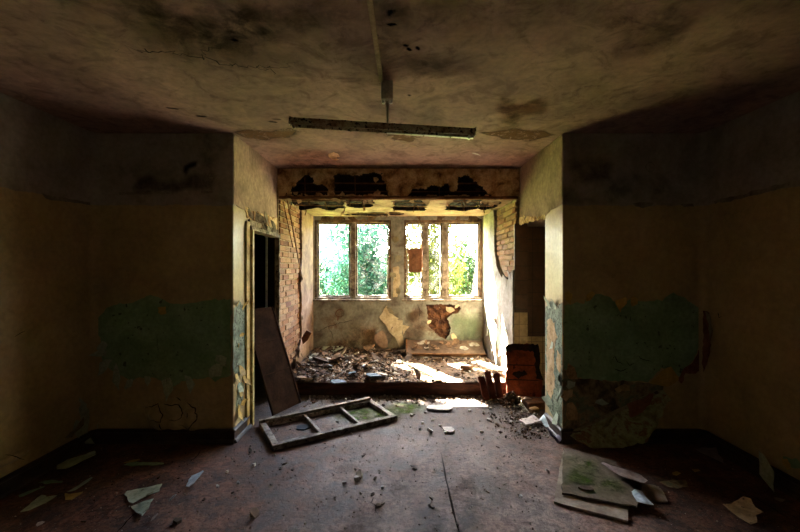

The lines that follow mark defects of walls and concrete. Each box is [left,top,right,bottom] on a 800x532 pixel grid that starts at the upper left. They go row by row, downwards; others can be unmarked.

leakage [500,100,547,123]
flaking render [246,171,545,366]
peeling [232,300,252,420]
peeling [541,296,664,429]